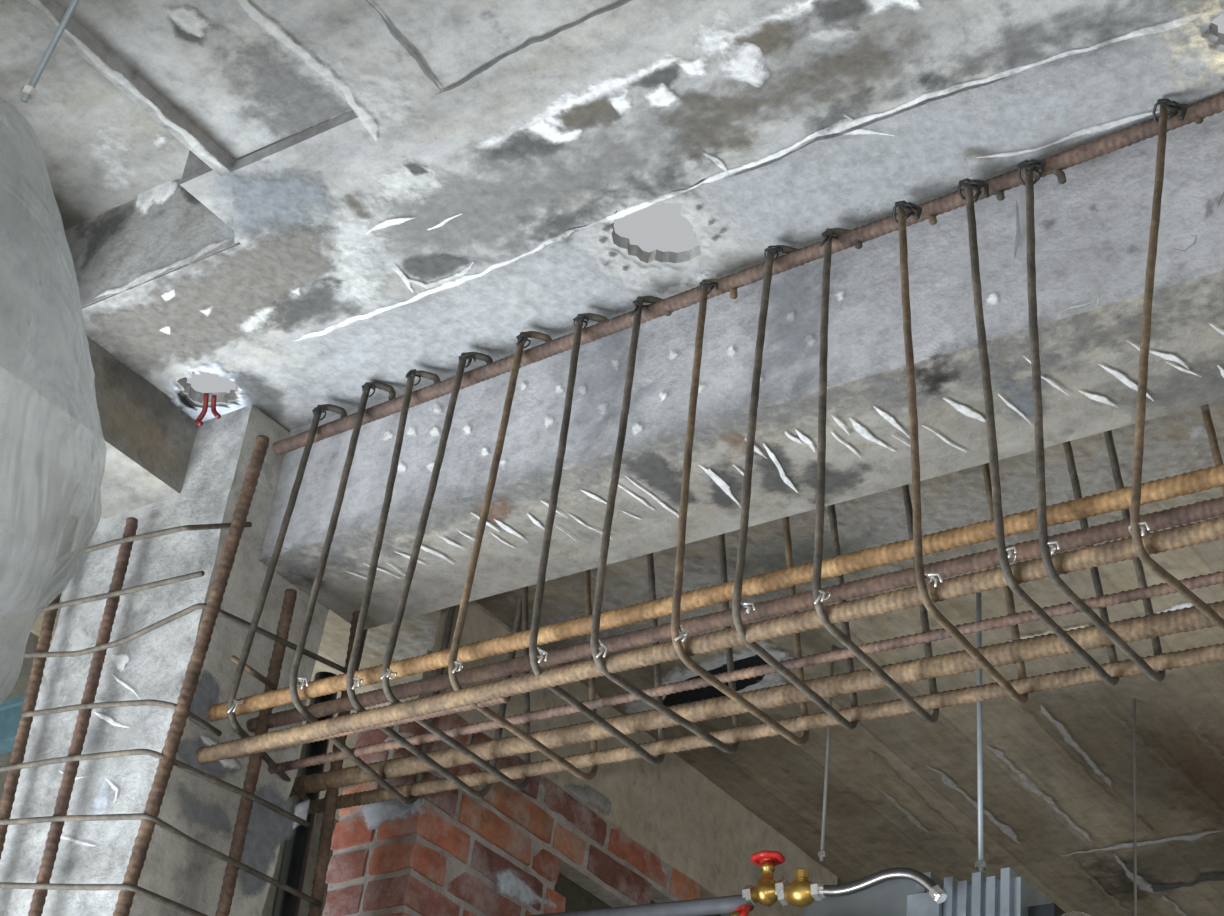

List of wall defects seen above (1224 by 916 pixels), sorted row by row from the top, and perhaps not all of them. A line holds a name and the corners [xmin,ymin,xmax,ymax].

spalling [1179,7,1224,80]
water stain [223,45,352,137]
water stain [365,41,906,261]
crack [296,0,1204,341]
water stain [86,171,359,469]
peeling [383,427,415,440]
peeling [430,405,441,437]
spalling [626,642,791,713]
peeling [178,671,241,778]
peeling [240,786,310,895]
crack [1063,830,1224,856]
crack [1141,873,1224,892]